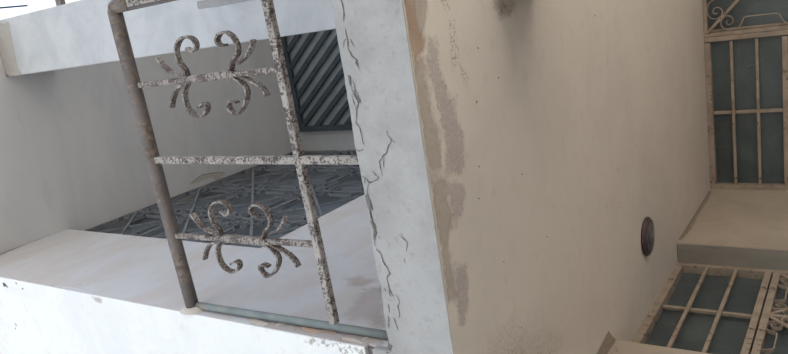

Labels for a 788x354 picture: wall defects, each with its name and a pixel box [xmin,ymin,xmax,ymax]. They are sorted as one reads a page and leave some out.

crack [340,0,363,152]
damp [415,61,440,169]
crack [362,134,408,329]
damp [434,181,455,298]